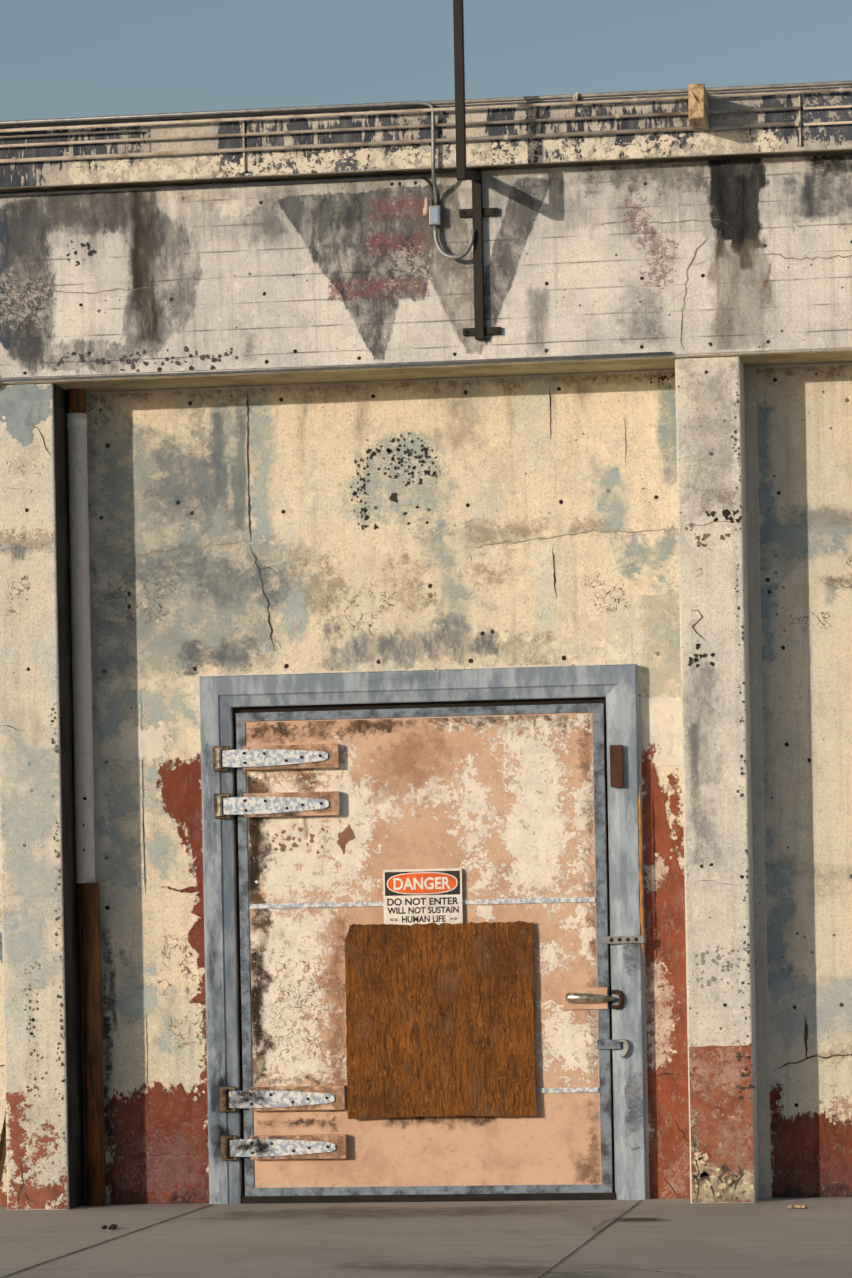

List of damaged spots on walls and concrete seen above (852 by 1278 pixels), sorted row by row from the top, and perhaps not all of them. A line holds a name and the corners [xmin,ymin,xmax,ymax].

peeling [67,127,784,184]
damp [678,158,768,349]
damp [788,154,852,217]
crack [93,391,285,651]
peeling [349,432,441,530]
spalling [682,374,747,725]
peeling [0,813,68,1210]
peeling [104,718,209,1204]
peeling [248,714,599,1088]
peeling [641,696,755,1203]
peeling [770,1080,852,1198]
crack [775,1014,852,1070]